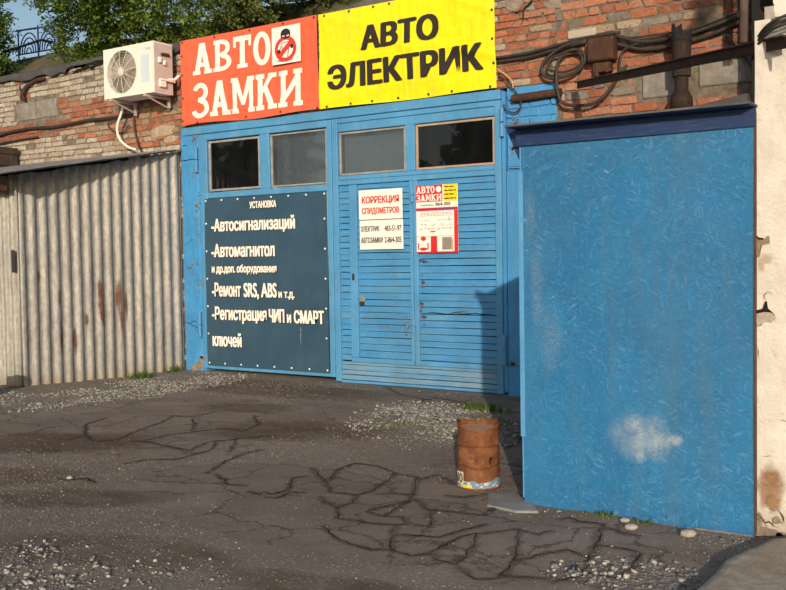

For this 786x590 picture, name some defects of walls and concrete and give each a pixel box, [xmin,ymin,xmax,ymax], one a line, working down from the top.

spalling [756,235,770,257]
rust [116,284,128,330]
spalling [756,301,776,327]
rust [758,472,782,510]